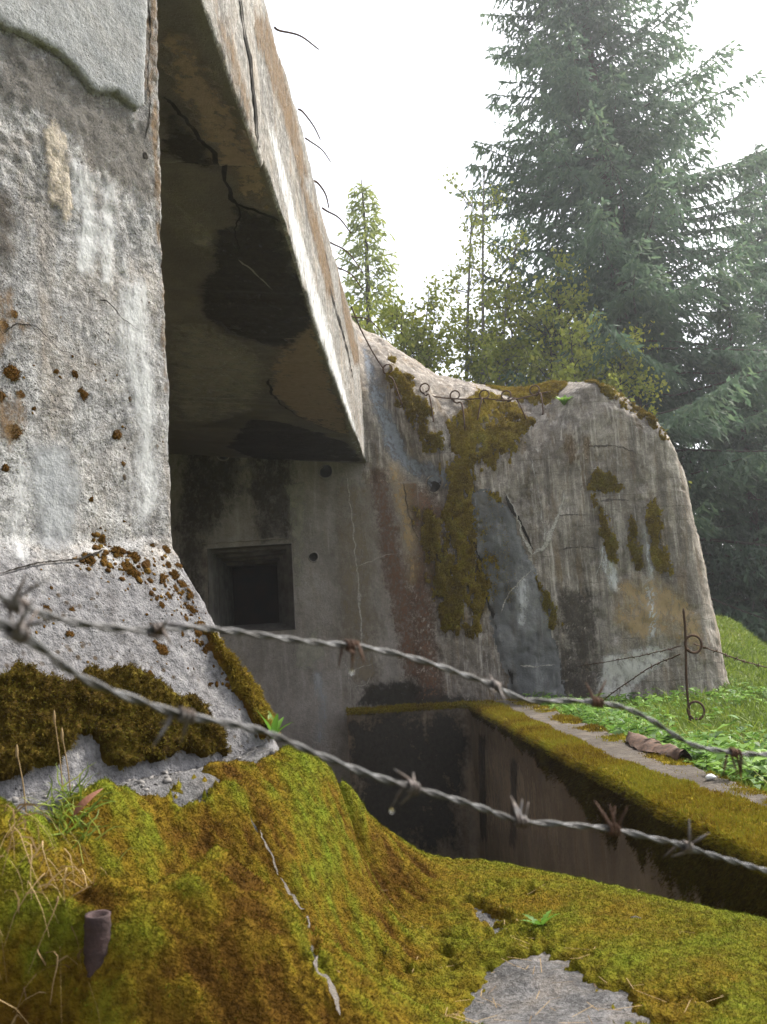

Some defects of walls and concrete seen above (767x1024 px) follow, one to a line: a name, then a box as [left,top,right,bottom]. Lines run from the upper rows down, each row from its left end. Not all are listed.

peeling [0,0,155,223]
crack [144,0,278,251]
leakage [159,31,360,599]
crack [505,493,534,551]
leakage [337,460,564,855]